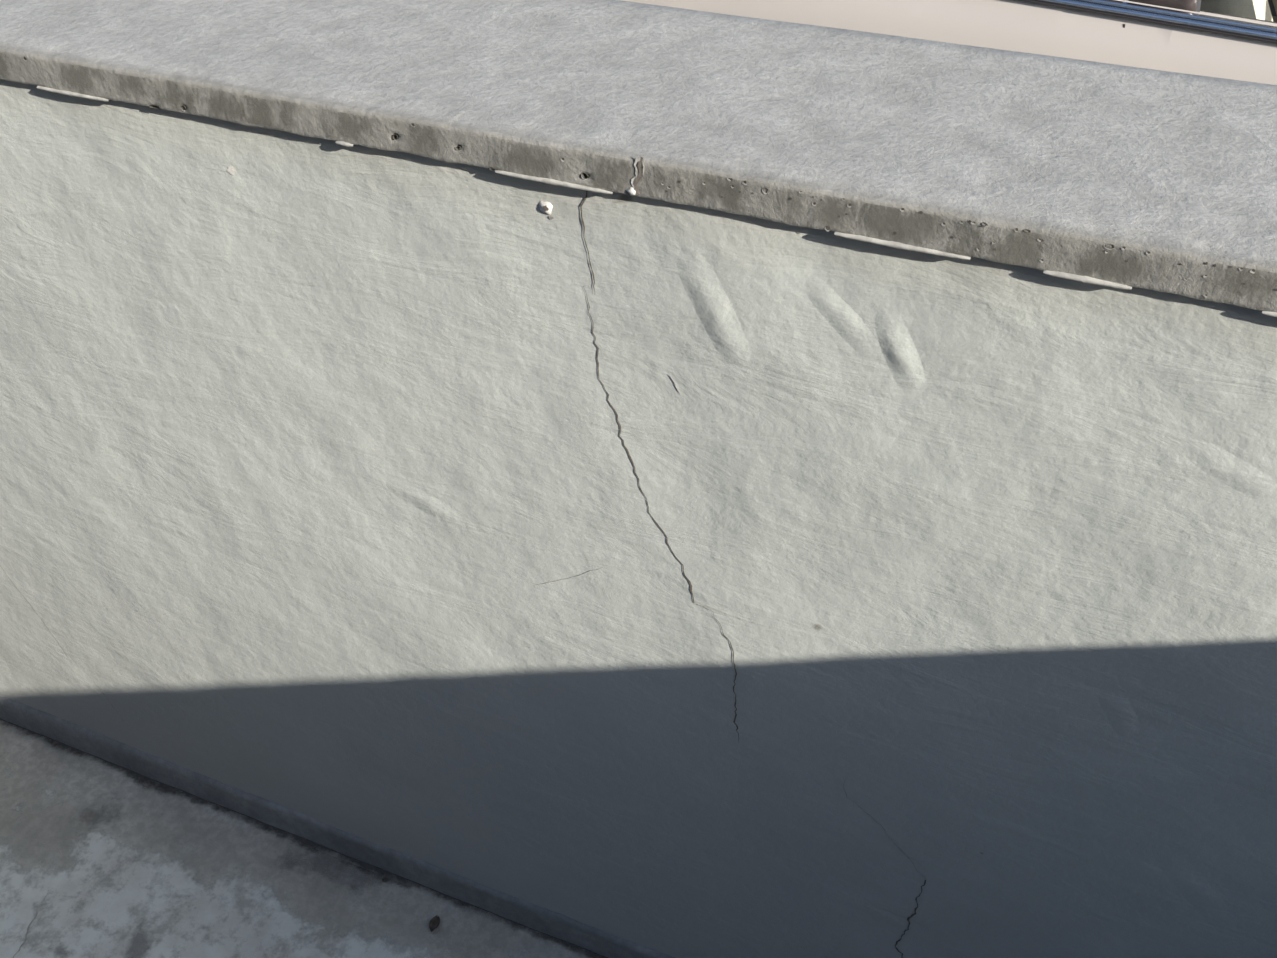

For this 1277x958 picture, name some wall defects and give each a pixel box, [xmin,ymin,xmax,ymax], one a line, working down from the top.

crack [626,156,645,196]
crack [580,191,739,743]
crack [843,778,926,958]